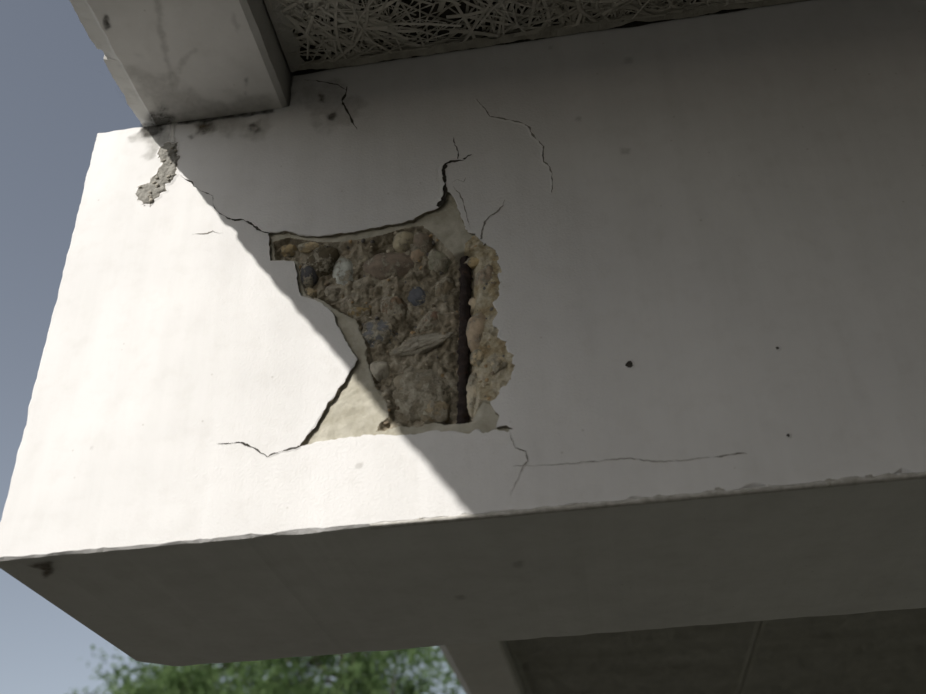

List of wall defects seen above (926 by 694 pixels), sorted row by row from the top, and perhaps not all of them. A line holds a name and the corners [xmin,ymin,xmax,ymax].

crack [316,80,357,129]
peeling [134,141,183,207]
crack [181,176,271,234]
crack [434,139,505,239]
crack [474,98,553,193]
spalling [270,194,515,446]
crack [219,442,300,458]
crack [509,430,747,495]